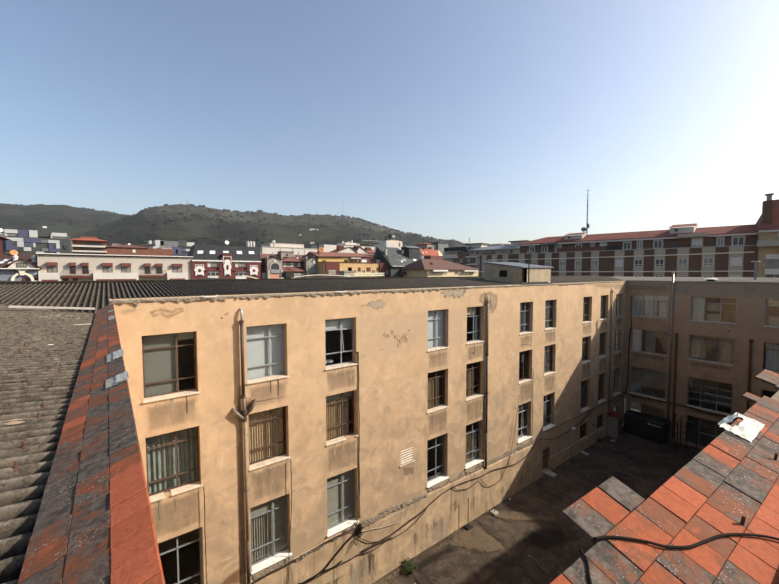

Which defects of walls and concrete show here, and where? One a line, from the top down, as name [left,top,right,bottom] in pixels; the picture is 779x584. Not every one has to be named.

flaking render [113,288,466,309]